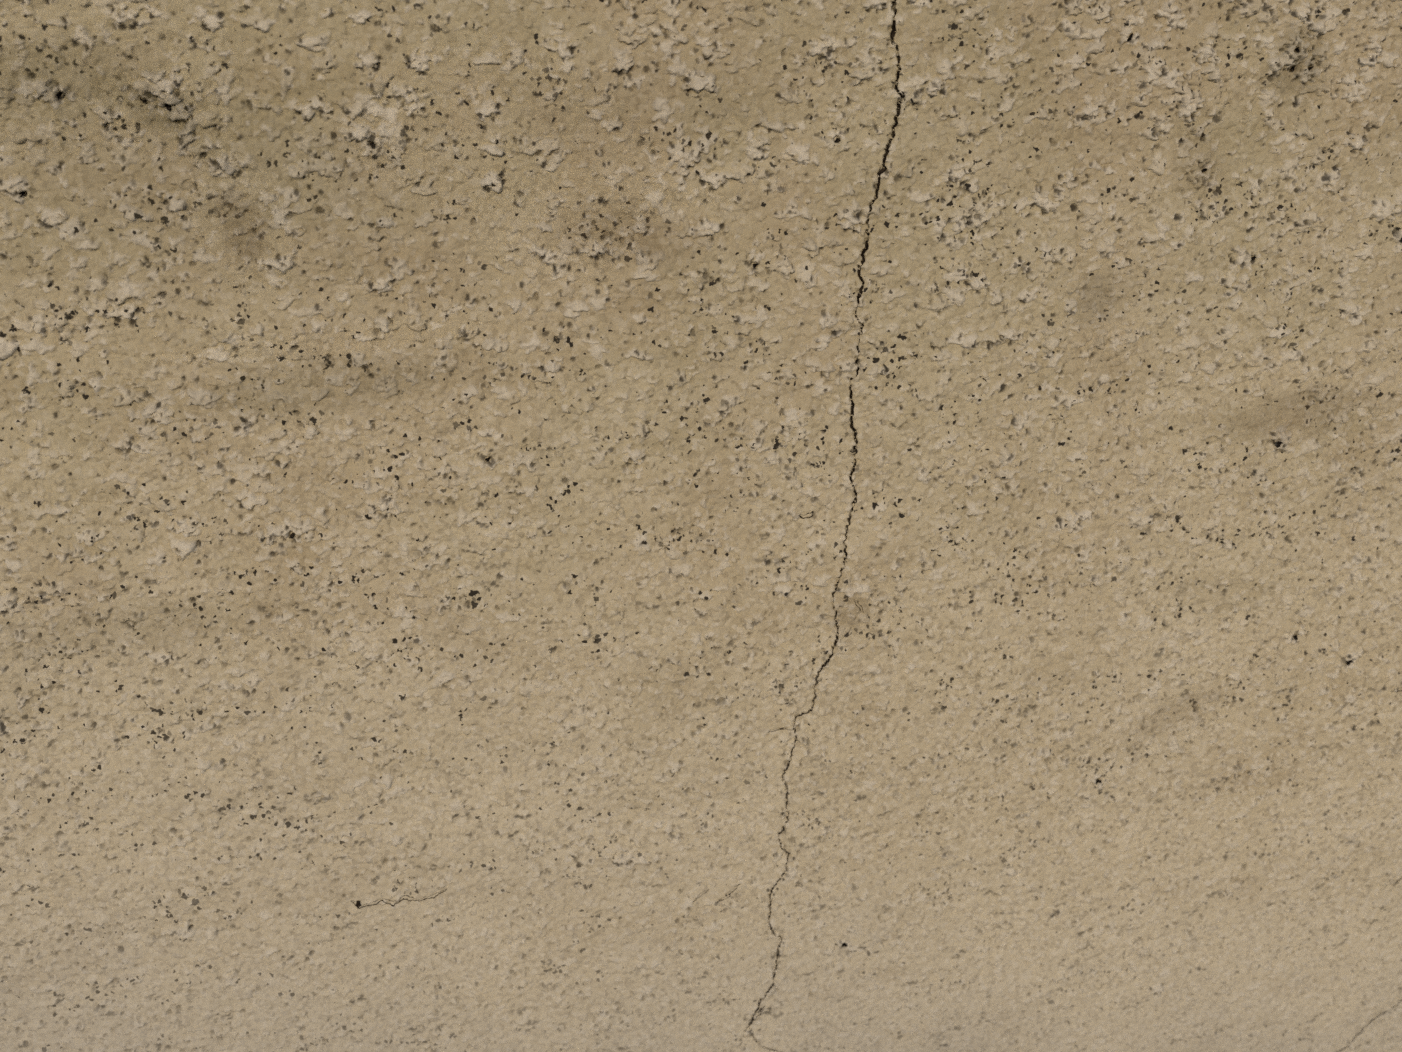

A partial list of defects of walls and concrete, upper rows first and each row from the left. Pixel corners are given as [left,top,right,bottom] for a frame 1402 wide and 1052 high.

crack [693,0,906,1052]